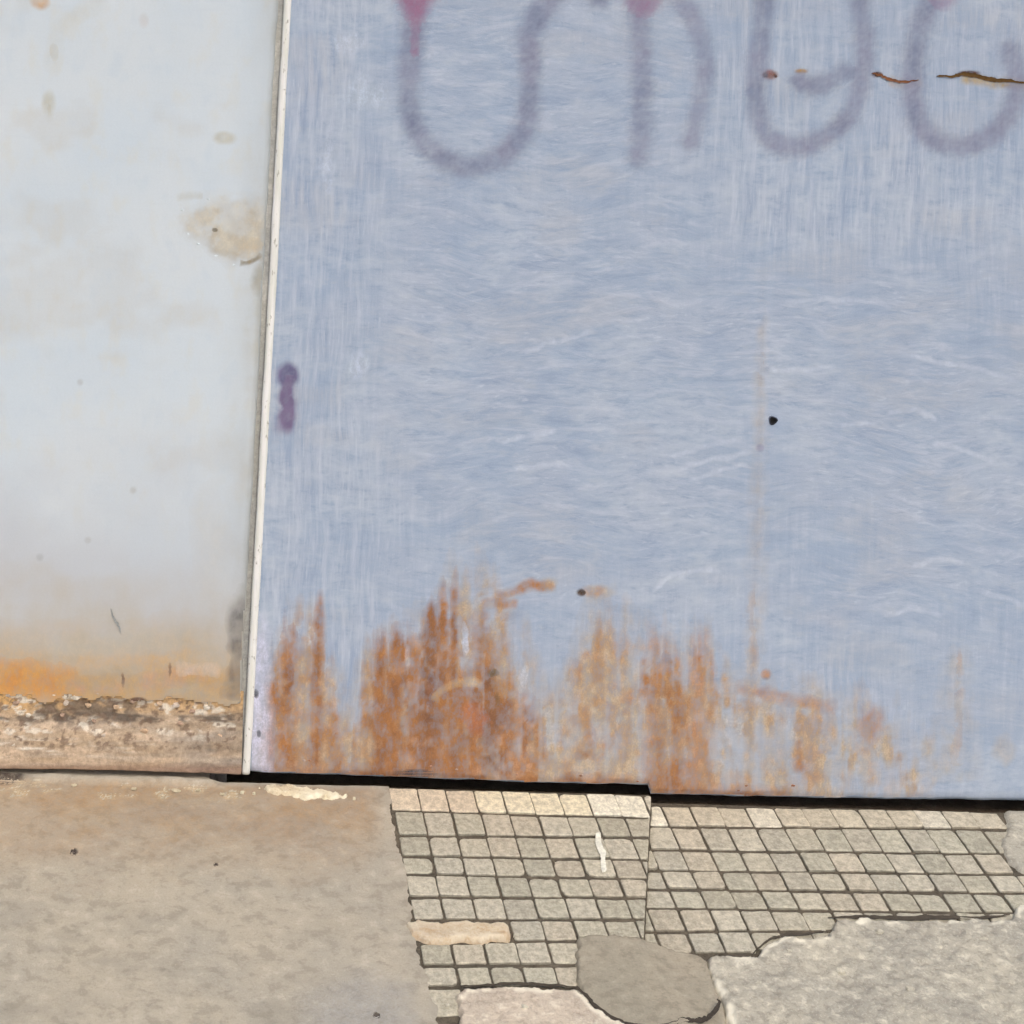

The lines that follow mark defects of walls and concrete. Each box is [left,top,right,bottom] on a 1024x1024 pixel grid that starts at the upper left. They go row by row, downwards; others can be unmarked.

spalling [0,606,356,803]
rust [0,303,938,904]